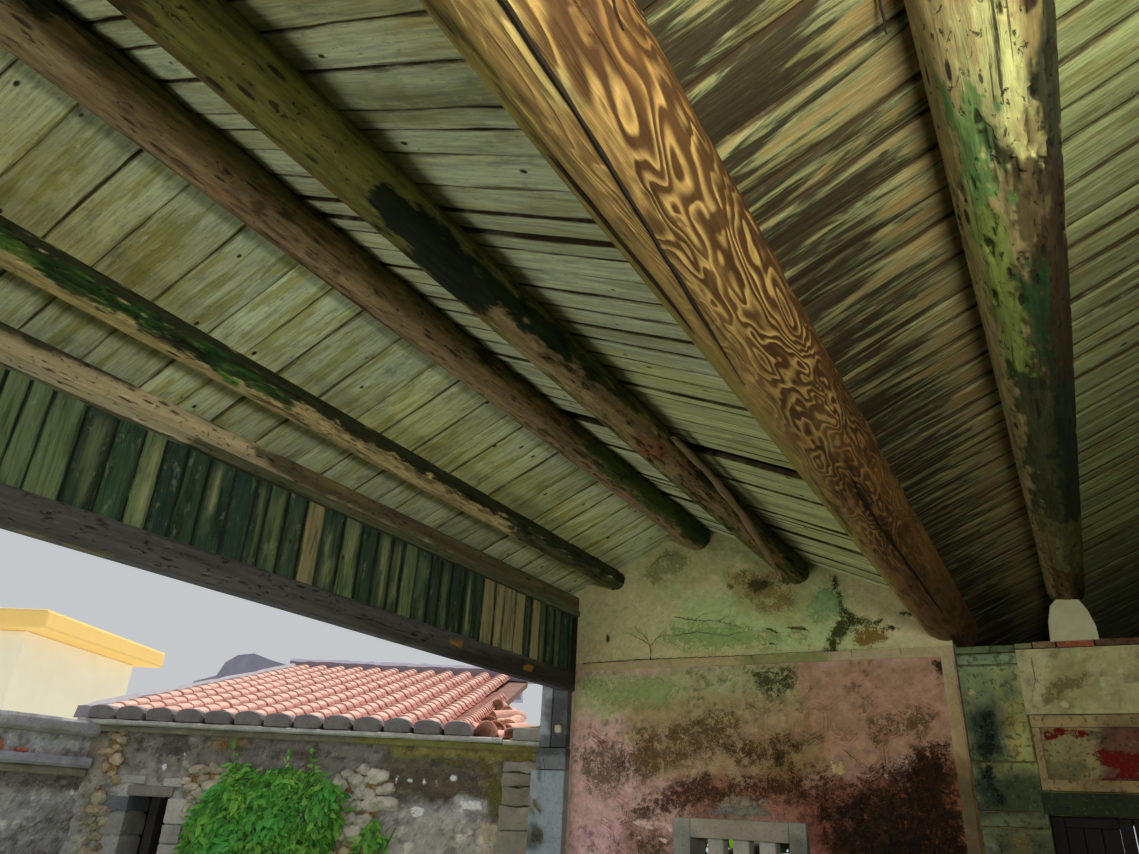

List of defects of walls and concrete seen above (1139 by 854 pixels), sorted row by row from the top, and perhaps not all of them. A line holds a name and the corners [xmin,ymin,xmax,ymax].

water stain [727,571,794,612]
peeling [1043,728,1089,740]
peeling [1087,749,1139,781]
water stain [622,733,968,854]